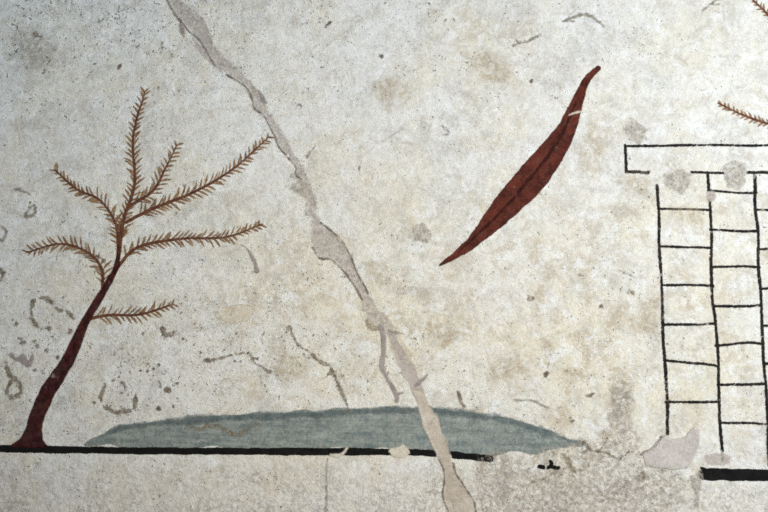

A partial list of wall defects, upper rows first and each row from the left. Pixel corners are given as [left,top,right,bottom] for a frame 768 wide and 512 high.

crack [167,0,477,512]
peeling [389,444,410,458]
spalling [477,380,703,512]